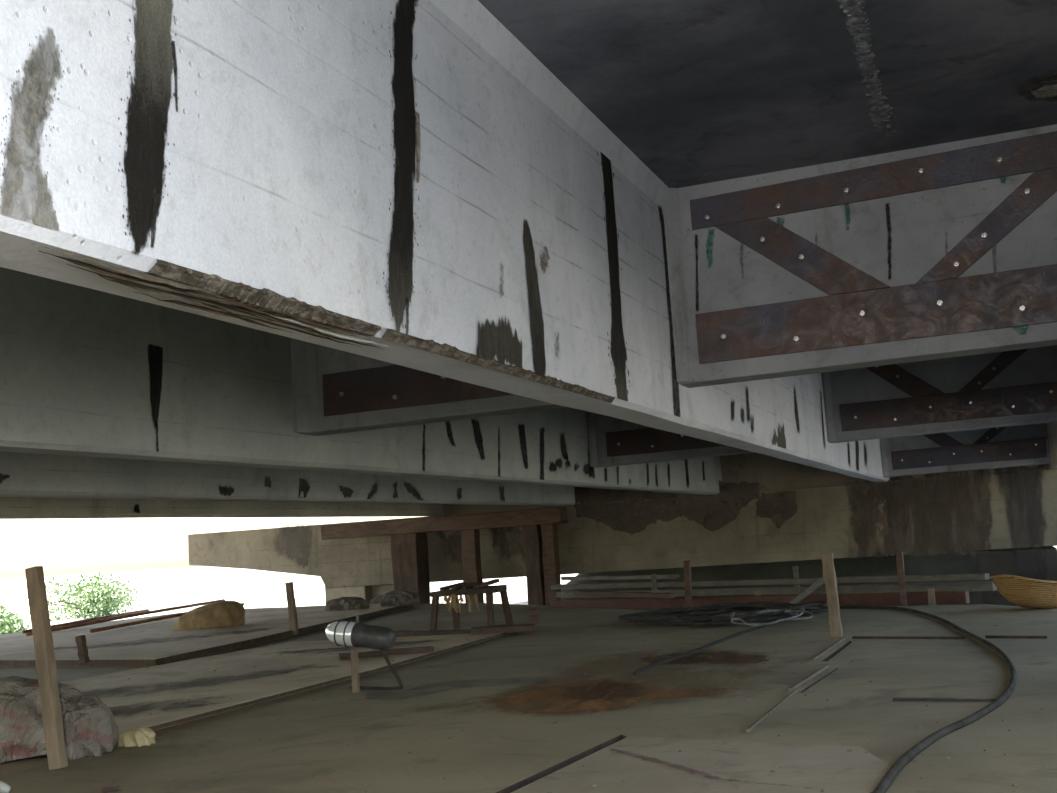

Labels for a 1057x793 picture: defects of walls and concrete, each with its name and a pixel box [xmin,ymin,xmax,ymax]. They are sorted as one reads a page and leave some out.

water stain [0,29,64,231]
water stain [540,247,549,272]
spalling [32,243,615,403]
water stain [476,317,523,370]
peeling [573,481,797,535]
water stain [844,465,1047,580]